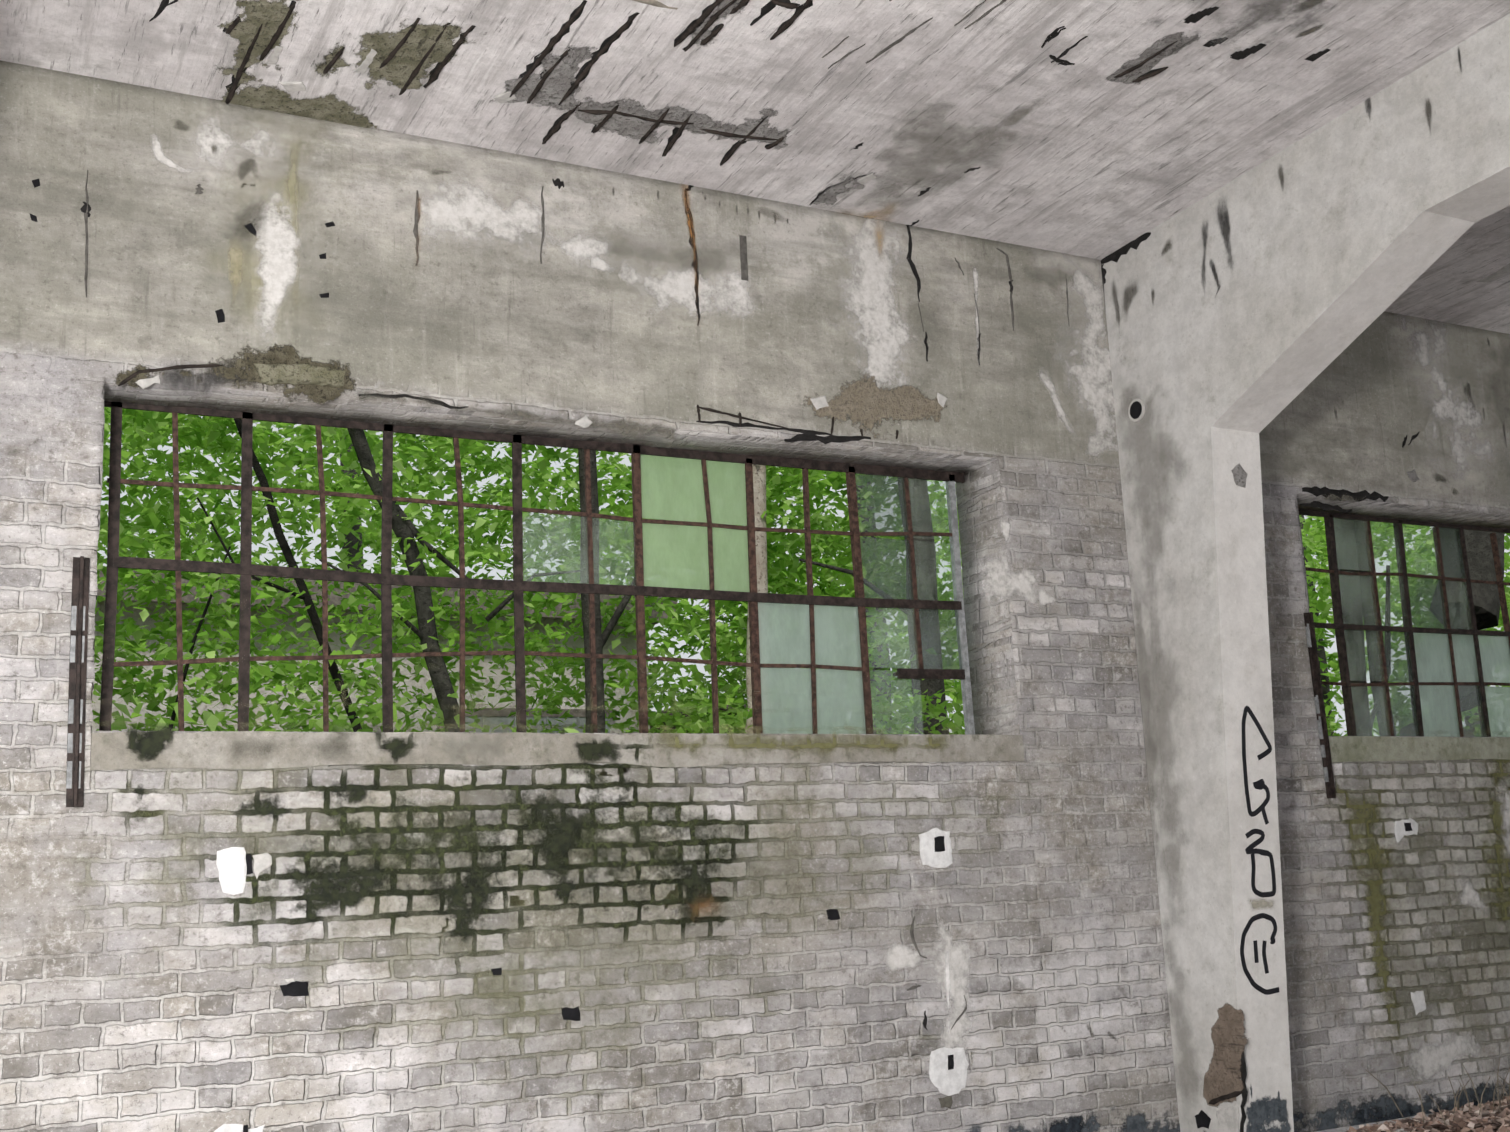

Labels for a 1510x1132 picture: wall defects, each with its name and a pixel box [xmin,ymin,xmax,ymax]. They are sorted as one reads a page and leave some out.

spalling [218,0,487,128]
spalling [490,0,789,166]
spalling [674,0,813,52]
peeling [176,119,274,178]
damp [229,162,299,329]
crack [684,185,700,326]
damp [842,218,909,387]
spalling [115,343,674,439]
peeling [696,374,948,444]
damp [1492,779,1505,906]
damp [1365,819,1399,1039]
spalling [1009,1003,1509,1132]